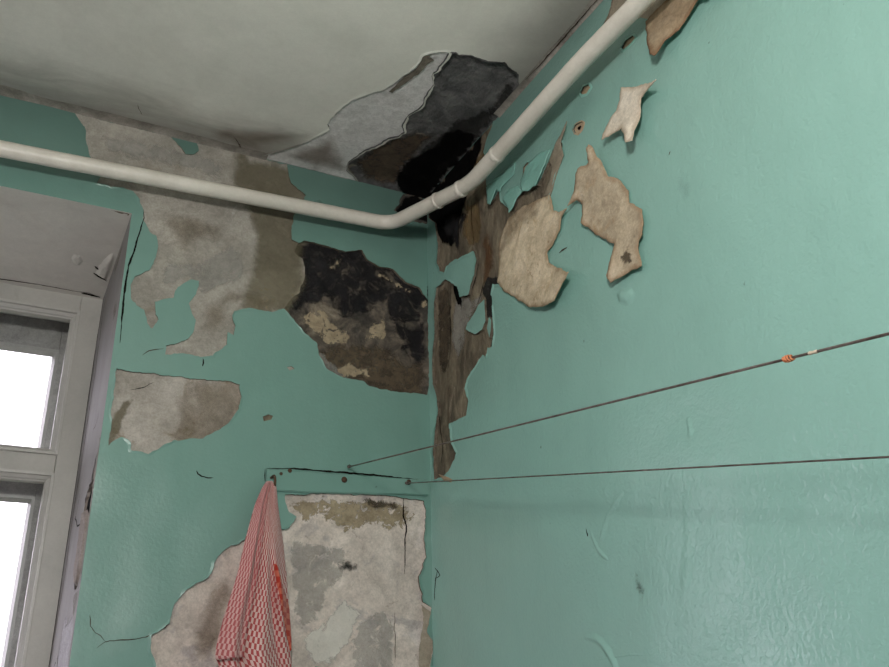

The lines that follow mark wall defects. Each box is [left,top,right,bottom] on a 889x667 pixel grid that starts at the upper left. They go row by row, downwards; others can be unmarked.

flaking render [602,0,627,25]
peeling [620,0,698,56]
spalling [74,49,519,213]
leakage [397,84,513,199]
peeling [602,79,656,143]
flaking render [94,120,644,481]
crack [0,212,145,663]
flaking render [54,367,245,667]
flaking render [281,493,433,667]